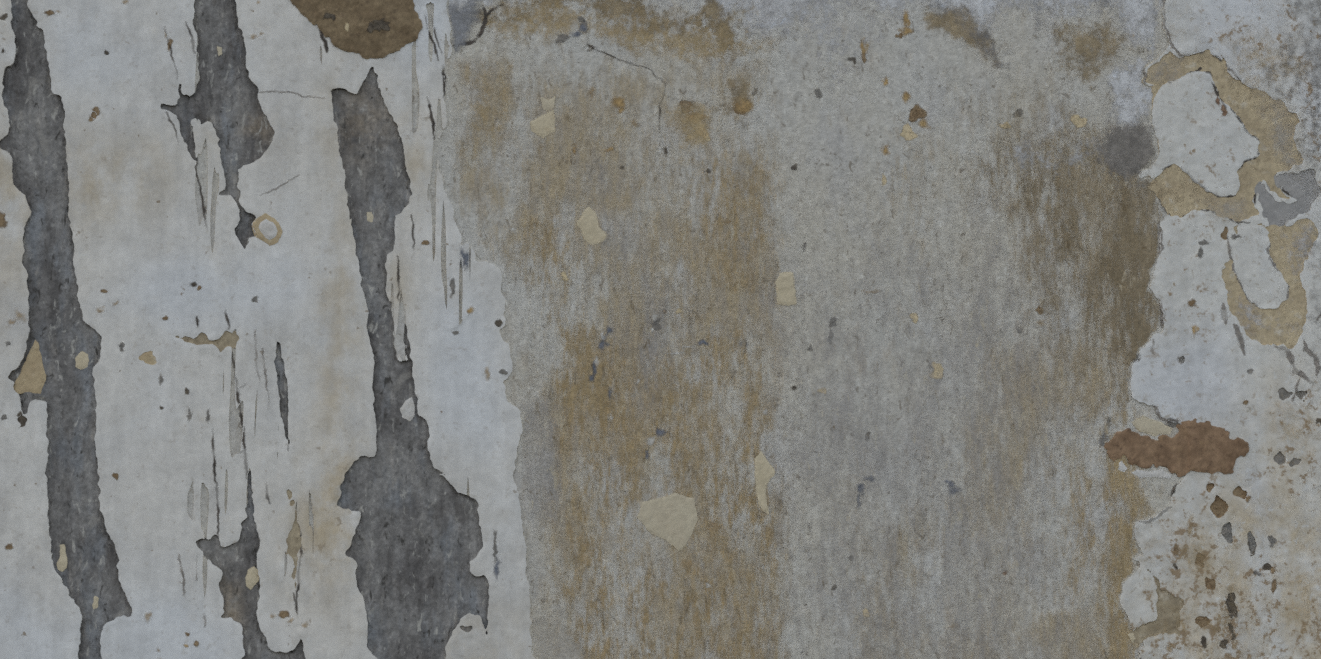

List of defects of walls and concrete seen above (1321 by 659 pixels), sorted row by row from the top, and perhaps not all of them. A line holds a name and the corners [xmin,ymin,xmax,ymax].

peeling [0,0,151,659]
peeling [139,351,163,384]
peeling [161,0,282,249]
peeling [196,471,306,659]
peeling [331,67,499,659]
water stain [448,0,1162,366]
spalling [1104,415,1277,592]
peeling [1142,49,1321,349]